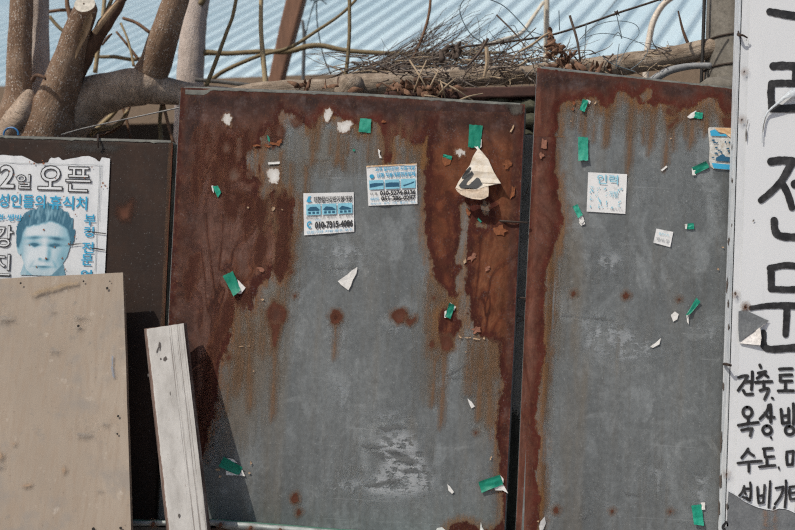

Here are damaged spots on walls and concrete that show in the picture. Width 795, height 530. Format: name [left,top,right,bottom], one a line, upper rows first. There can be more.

rust [163,68,732,530]